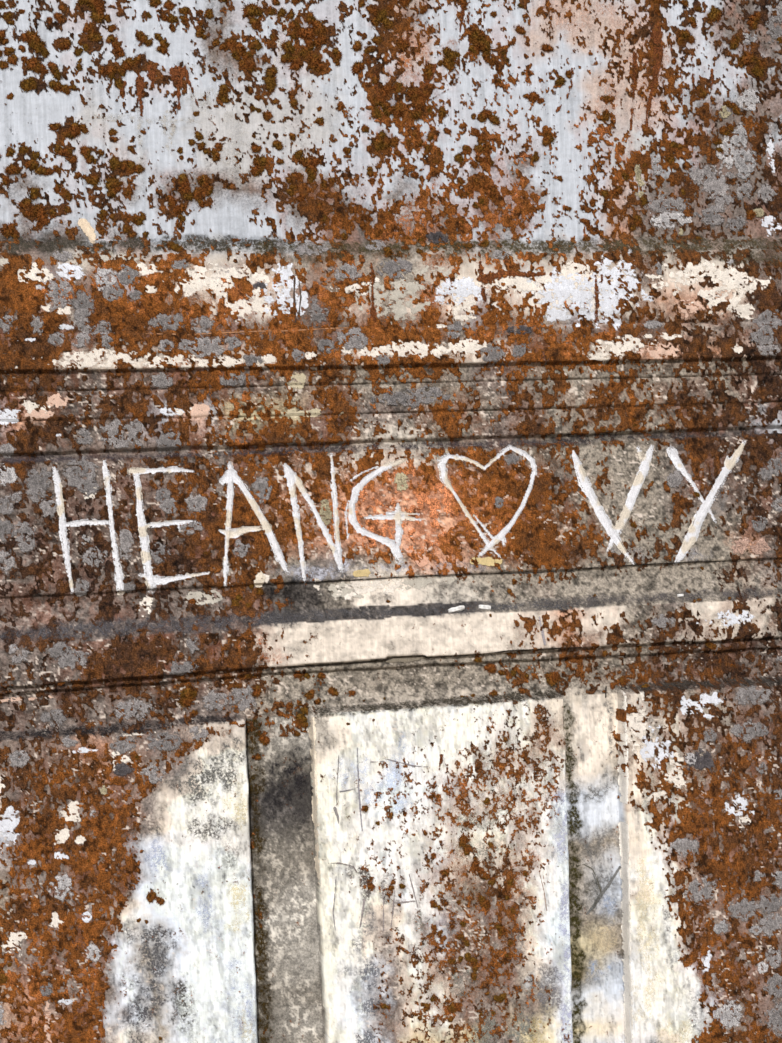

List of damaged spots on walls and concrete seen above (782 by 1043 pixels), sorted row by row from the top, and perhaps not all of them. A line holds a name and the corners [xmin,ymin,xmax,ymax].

rust [1,0,23,56]
rust [10,46,49,95]
rust [370,941,394,1043]